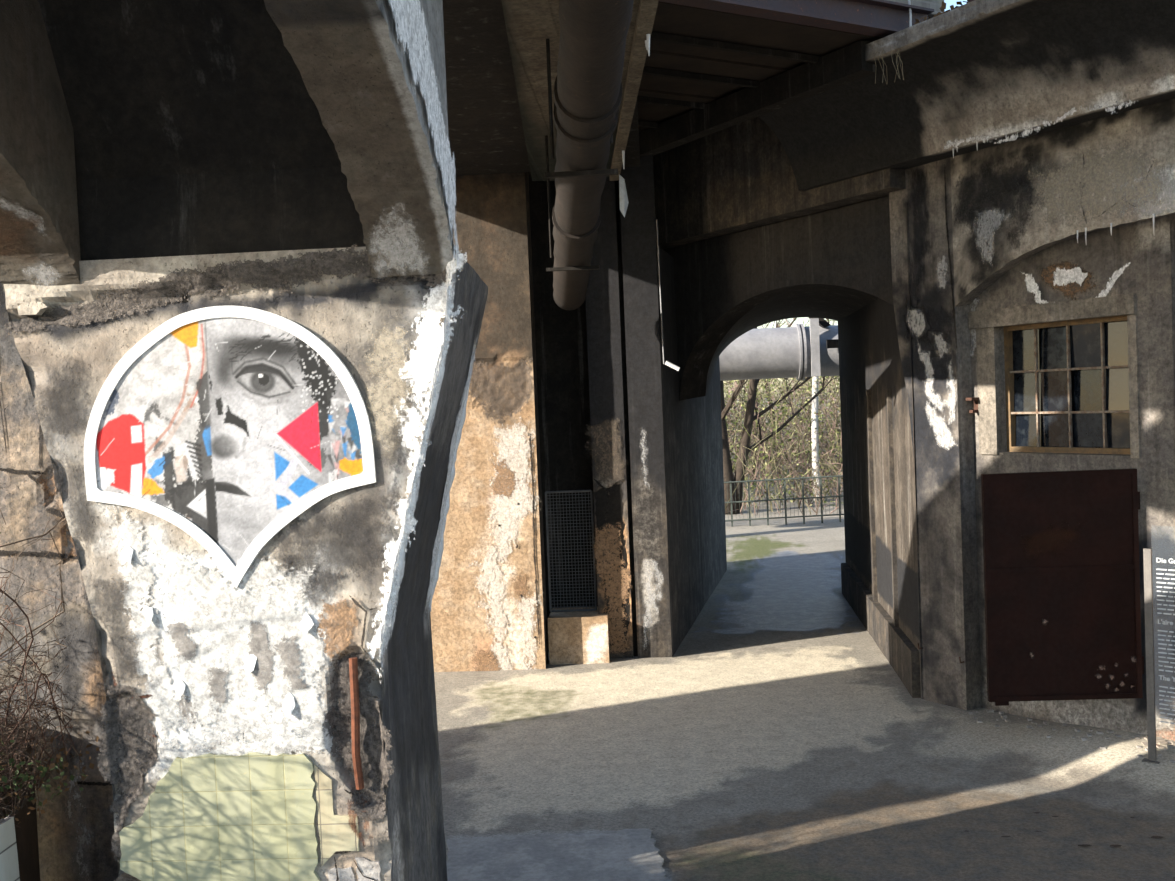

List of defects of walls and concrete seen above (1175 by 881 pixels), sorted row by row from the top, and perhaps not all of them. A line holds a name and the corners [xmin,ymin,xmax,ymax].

damp [944,100,1138,149]
flaking render [367,328,413,456]
spalling [585,418,625,483]
peeling [469,417,541,671]
spalling [592,523,632,656]
peeling [96,504,395,881]